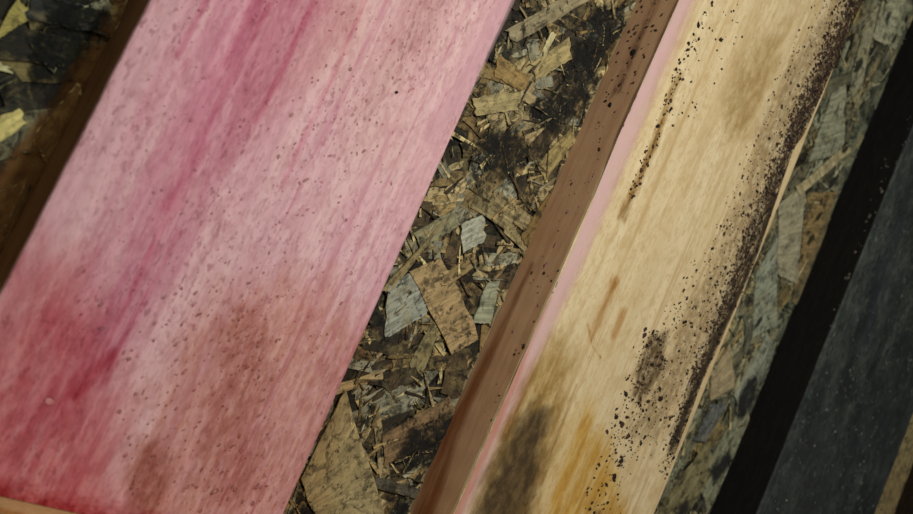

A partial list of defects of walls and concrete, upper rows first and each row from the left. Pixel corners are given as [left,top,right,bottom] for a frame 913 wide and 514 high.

leakage [0,0,148,290]
leakage [263,64,389,201]
leakage [386,0,723,514]
leakage [710,15,913,514]